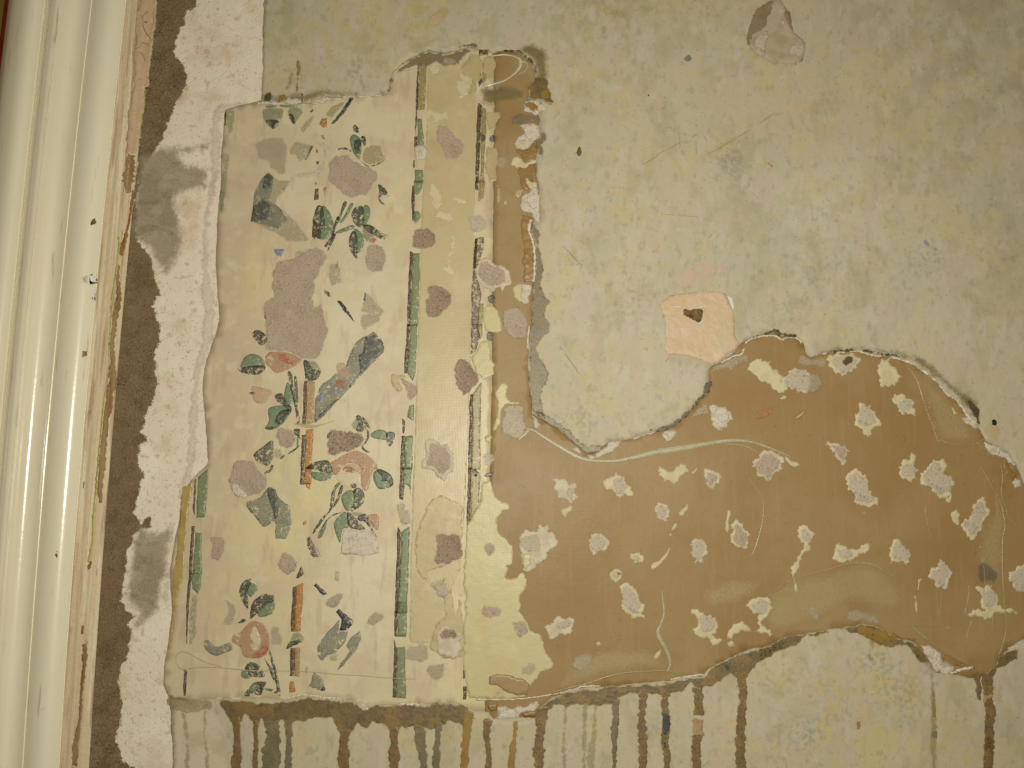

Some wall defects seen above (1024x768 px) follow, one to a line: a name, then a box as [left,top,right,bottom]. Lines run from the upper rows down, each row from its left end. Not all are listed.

peeling [125,0,157,159]
leakage [89,0,199,768]
flaking render [262,247,329,359]
flaking render [455,258,532,438]
peeling [747,358,822,399]
flaking render [899,452,991,540]
peeling [397,481,575,699]
flaking render [691,597,774,648]
leakage [167,696,493,768]
leakage [507,721,518,768]
leakage [532,630,829,768]
leakage [842,624,937,768]